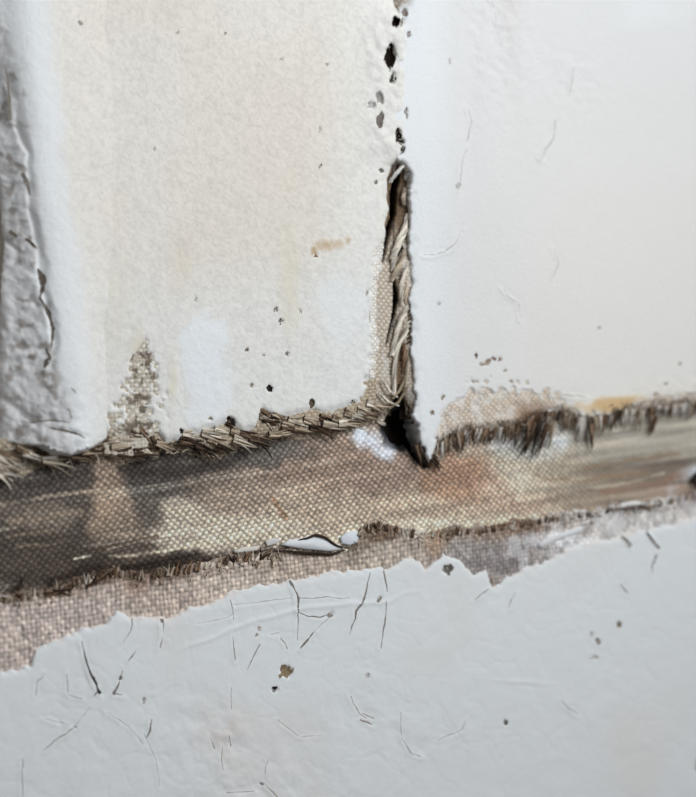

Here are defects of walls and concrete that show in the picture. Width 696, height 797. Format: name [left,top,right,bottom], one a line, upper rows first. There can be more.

spalling [114,340,164,437]
peeling [613,501,661,511]
peeling [233,530,359,555]
peeling [272,664,294,692]